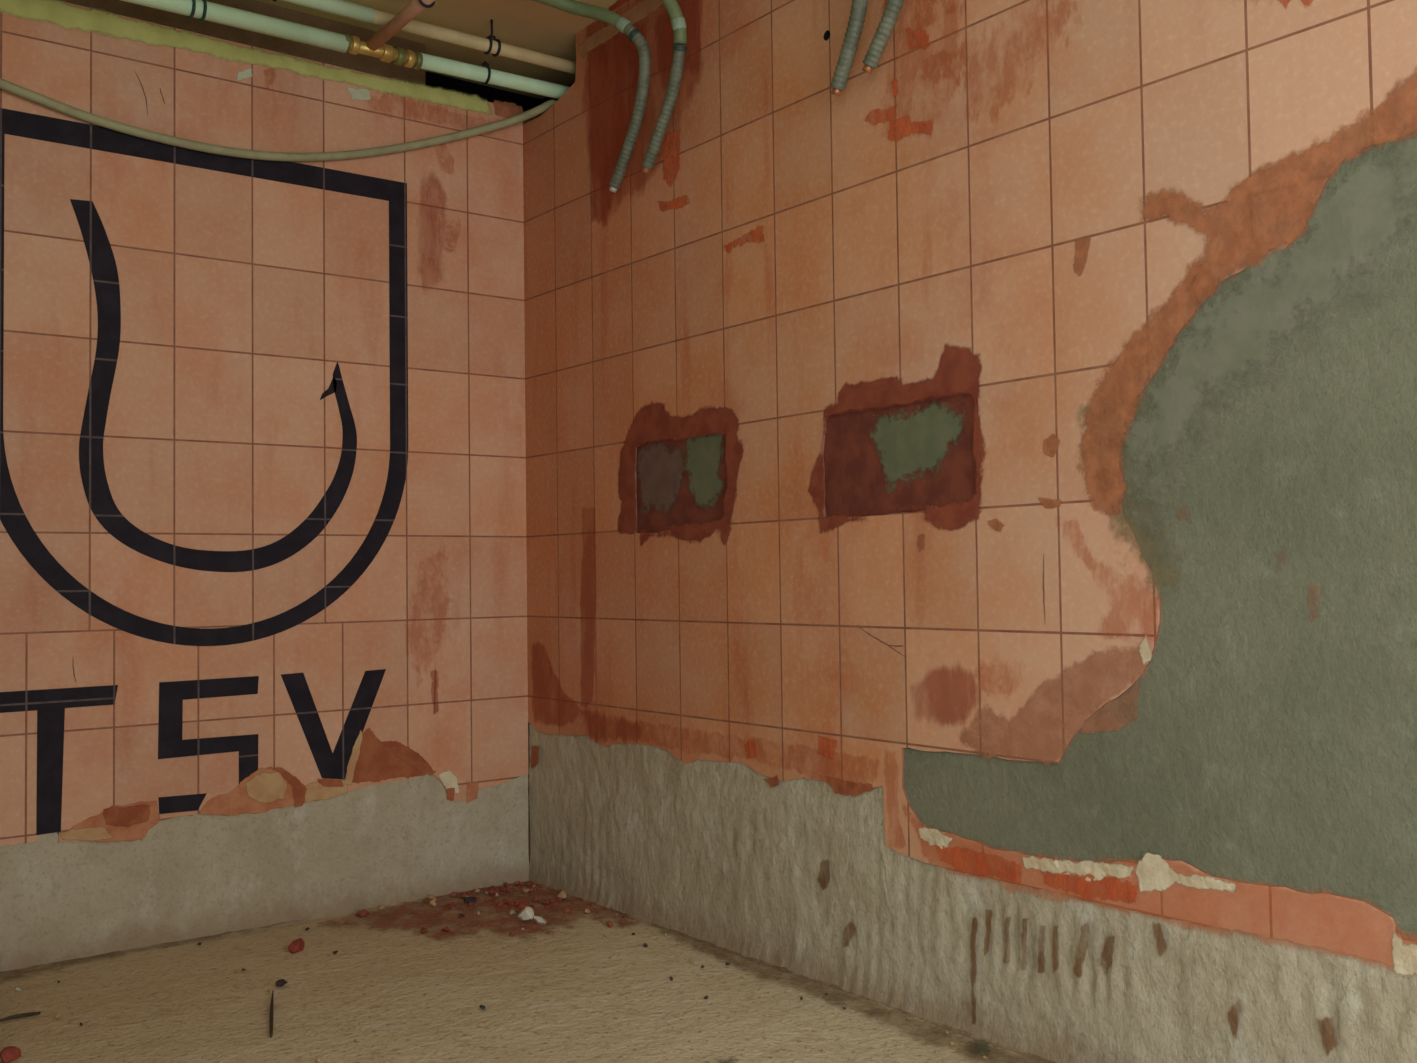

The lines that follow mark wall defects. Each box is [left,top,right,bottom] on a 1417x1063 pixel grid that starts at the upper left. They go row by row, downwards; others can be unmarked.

spalling [618,403,744,545]
spalling [808,344,985,532]
spalling [904,73,1417,941]
spalling [0,723,1417,1063]